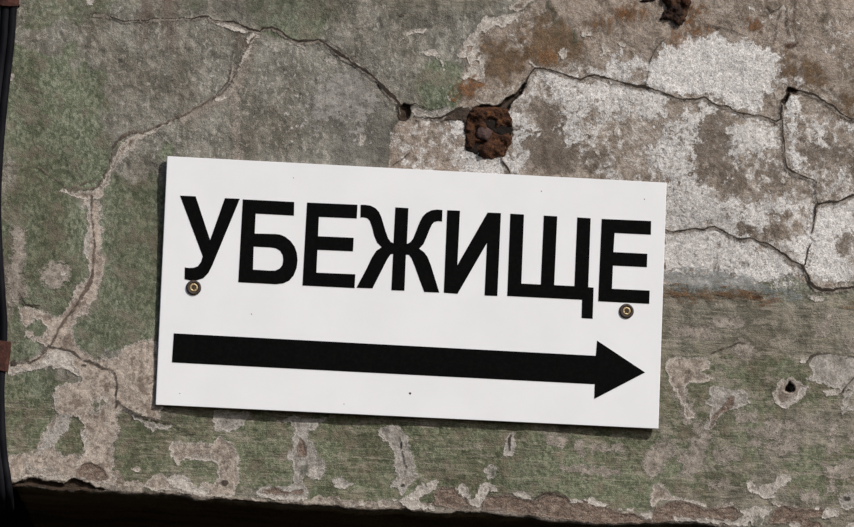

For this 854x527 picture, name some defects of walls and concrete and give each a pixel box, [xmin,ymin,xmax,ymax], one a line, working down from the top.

crack [768,0,797,41]
peeling [456,0,534,105]
spalling [484,119,513,135]
crack [6,12,854,293]
peeling [668,315,744,340]
peeling [808,295,836,338]
spalling [378,329,854,527]